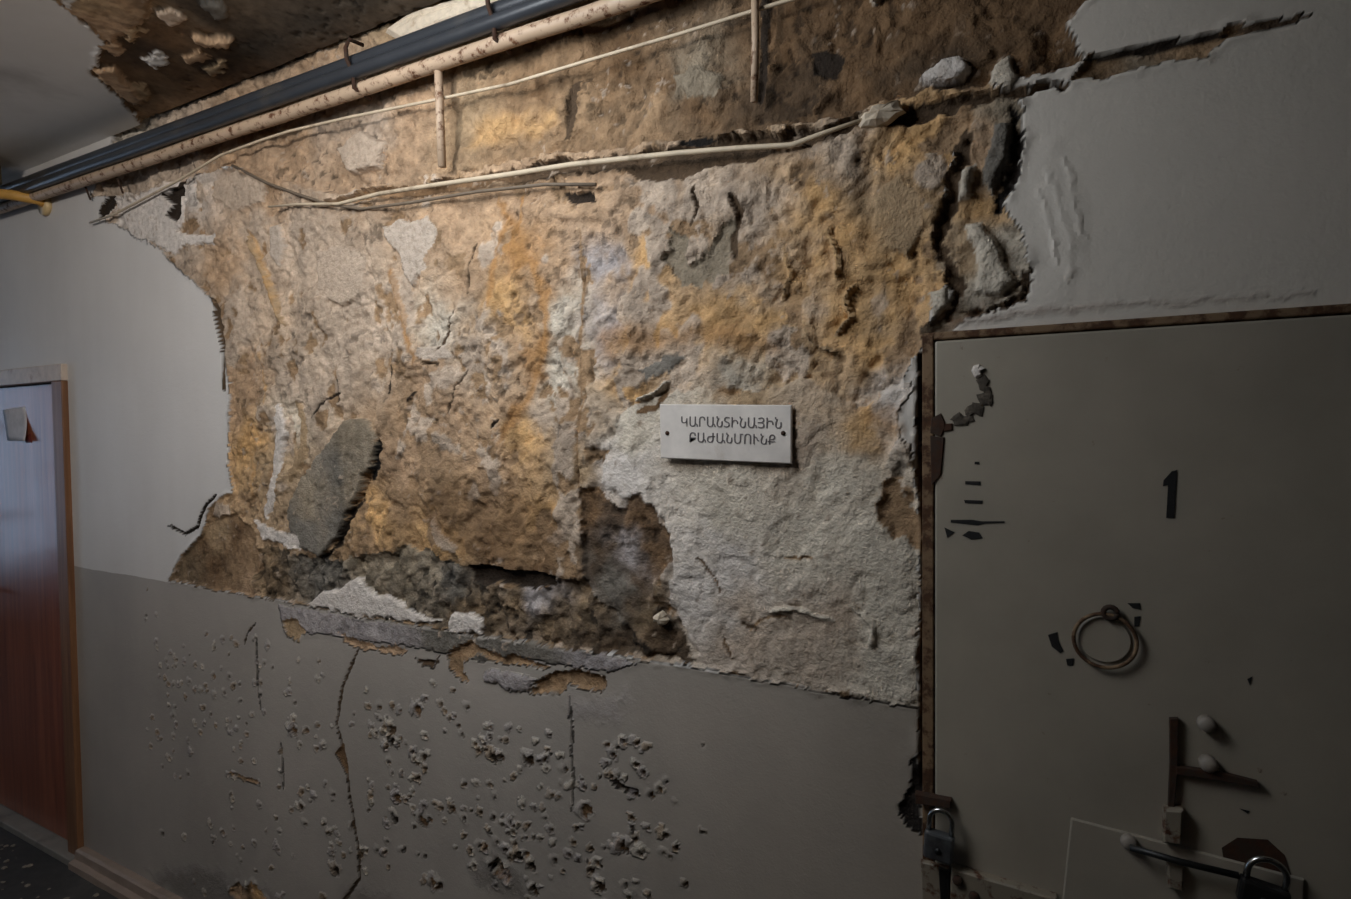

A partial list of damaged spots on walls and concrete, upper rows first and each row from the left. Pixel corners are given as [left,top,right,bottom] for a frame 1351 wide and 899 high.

peeling [57,0,1313,705]
crack [336,646,361,881]